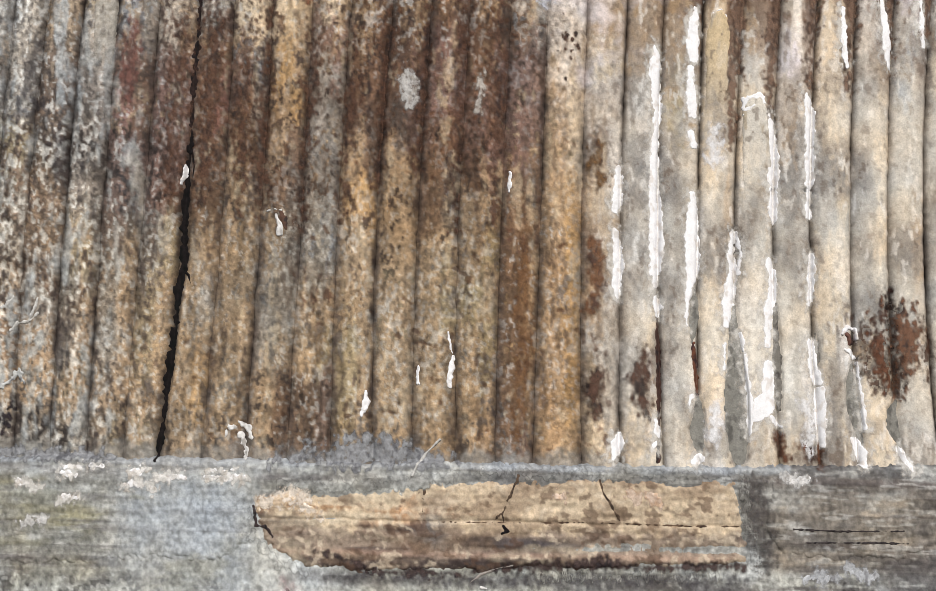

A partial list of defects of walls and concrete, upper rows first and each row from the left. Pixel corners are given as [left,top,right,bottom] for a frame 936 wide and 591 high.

flaking render [681,6,730,149]
spalling [834,1,850,69]
spalling [872,0,897,71]
flaking render [741,92,783,227]
spalling [798,84,819,221]
crack [153,0,203,462]
spalling [605,160,627,302]
spalling [644,45,666,464]
spalling [675,189,708,469]
spalling [717,226,786,465]
corrosion [851,287,930,401]
water stain [0,400,17,435]